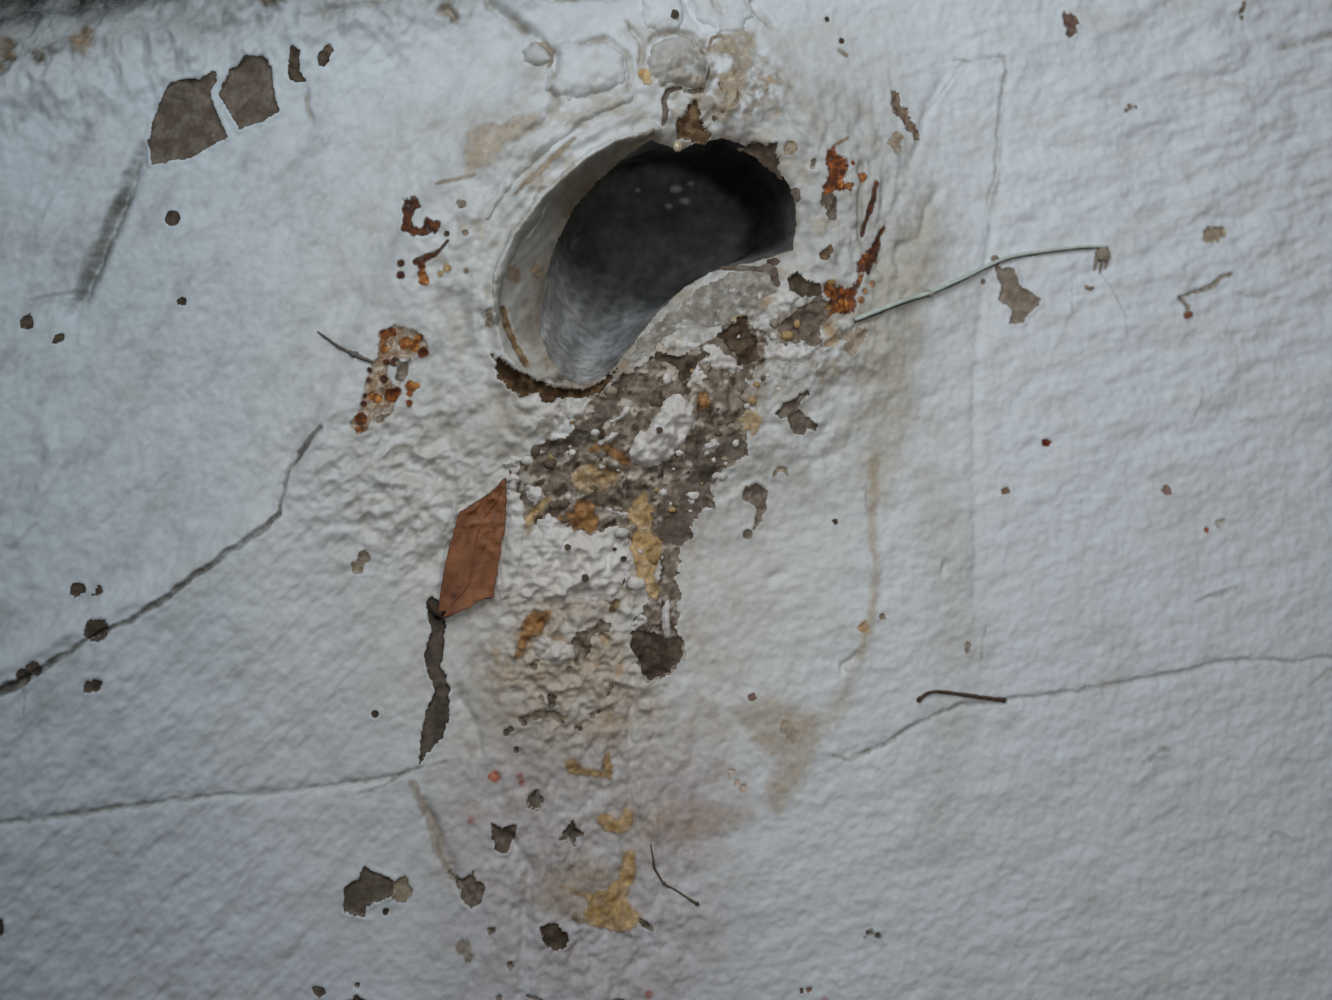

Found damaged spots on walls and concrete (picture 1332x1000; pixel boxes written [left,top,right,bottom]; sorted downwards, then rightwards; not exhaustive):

peeling [147,45,306,164]
corrosion [397,196,469,285]
corrosion [820,136,885,321]
corrosion [350,324,428,434]
damp [558,443,631,534]
spalling [485,258,831,683]
crack [0,430,318,710]
peeling [418,596,451,765]
damp [515,610,551,658]
crack [833,740,891,761]
peeling [343,866,413,917]
damp [541,850,654,932]